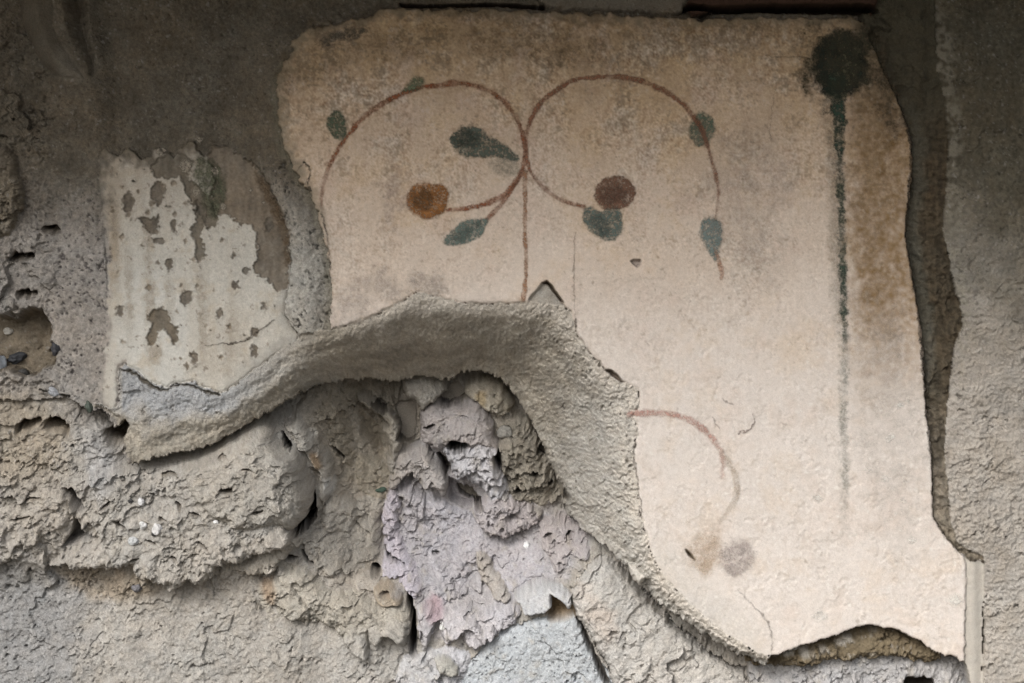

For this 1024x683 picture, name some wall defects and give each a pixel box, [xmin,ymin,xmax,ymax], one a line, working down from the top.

flaking render [110,137,292,292]
flaking render [146,283,200,346]
flaking render [180,351,199,372]
flaking render [249,328,269,358]
spalling [13,416,71,438]
spalling [102,420,130,449]
spalling [0,461,116,571]
spalling [249,370,970,683]